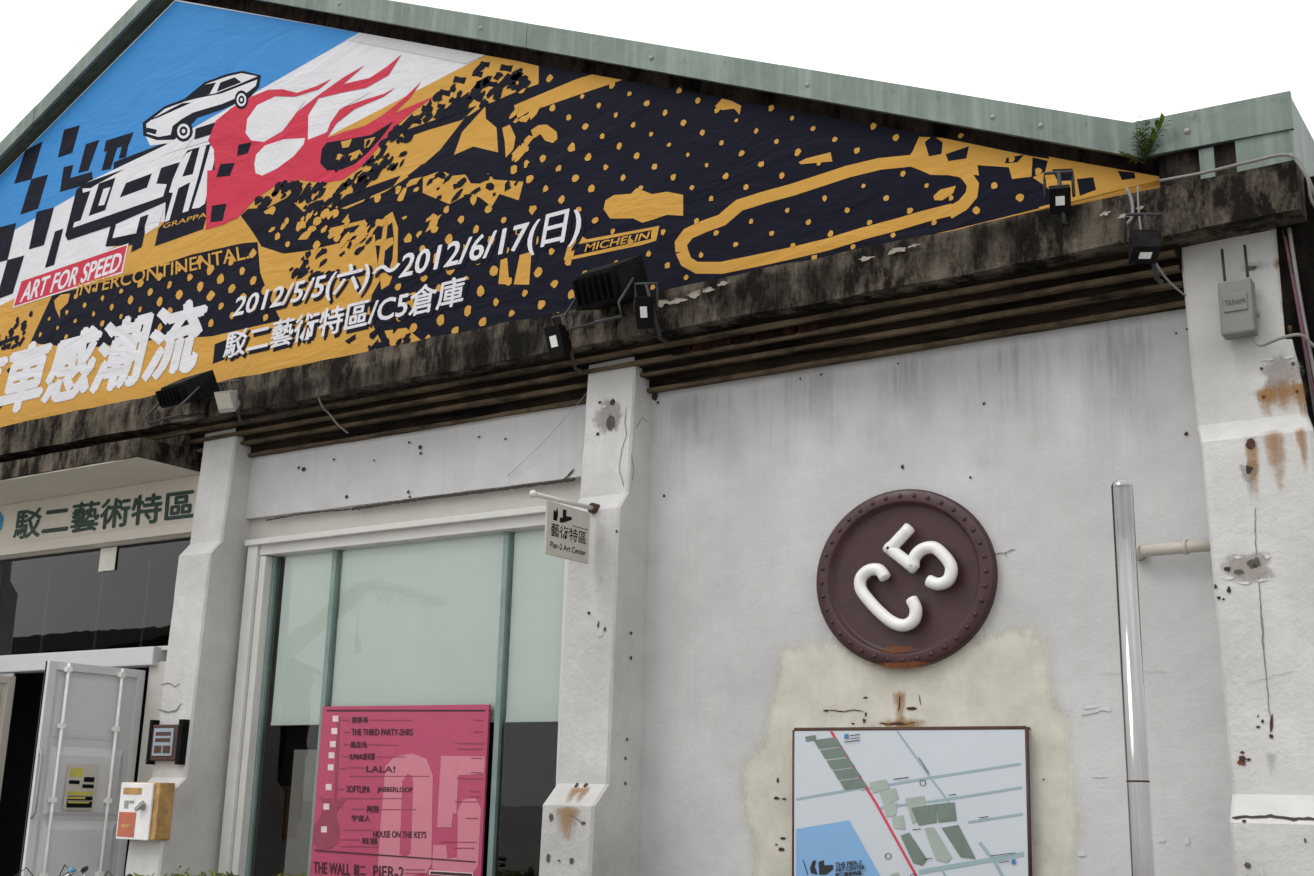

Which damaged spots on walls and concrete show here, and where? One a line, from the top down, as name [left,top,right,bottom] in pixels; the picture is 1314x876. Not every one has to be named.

peeling [658,281,730,307]
flaking render [594,398,620,436]
corrosion [1245,434,1282,478]
flaking render [1214,552,1272,601]
corrosion [881,646,925,669]
corrosion [823,693,921,727]
peeling [742,628,1086,876]
corrosion [560,783,588,828]